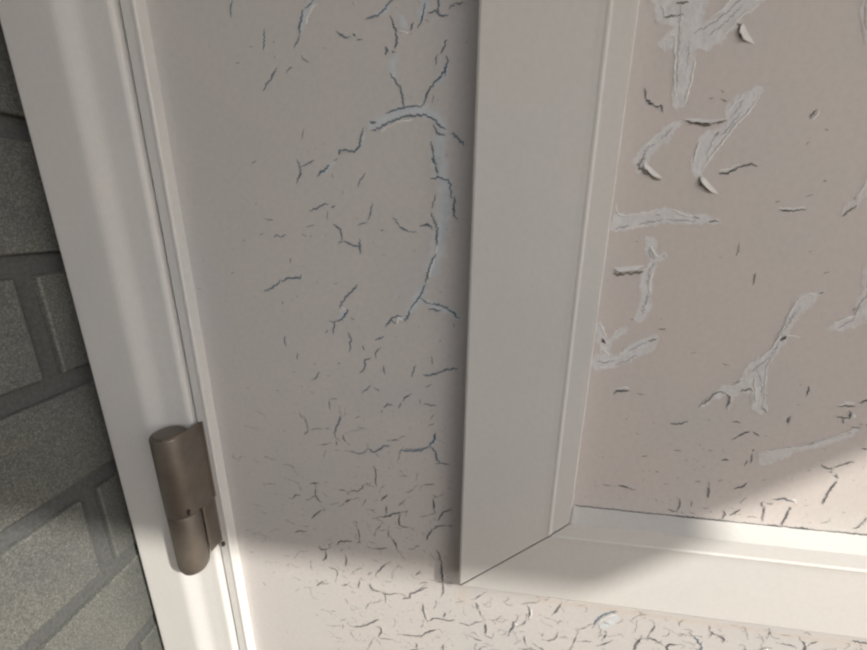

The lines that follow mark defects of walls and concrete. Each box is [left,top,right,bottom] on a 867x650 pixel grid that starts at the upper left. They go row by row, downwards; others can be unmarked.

peeling [630,0,768,195]
crack [233,0,867,650]
peeling [591,204,722,372]
peeling [698,288,827,415]